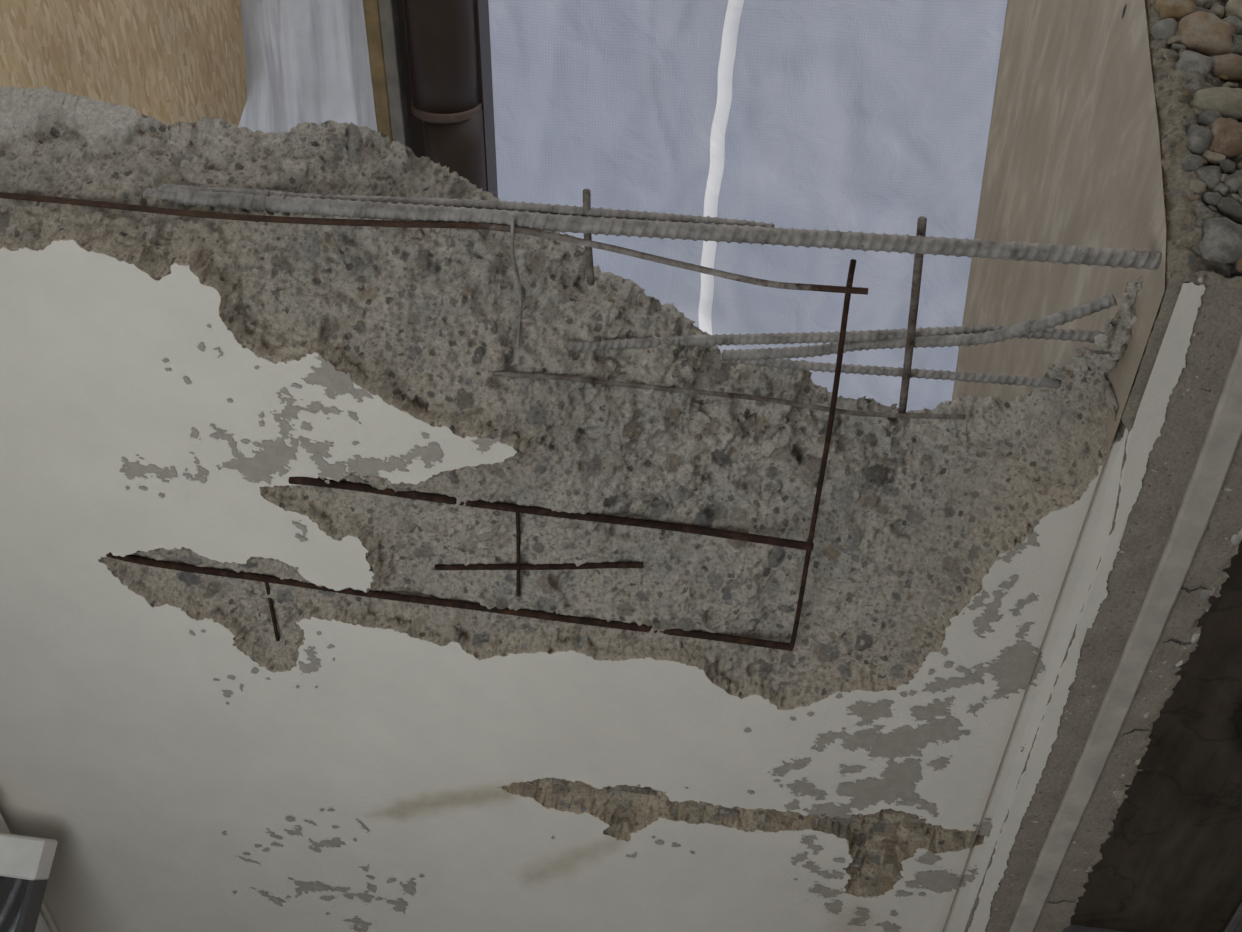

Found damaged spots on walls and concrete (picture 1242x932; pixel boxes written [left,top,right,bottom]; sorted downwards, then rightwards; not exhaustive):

spalling [0,0,1242,717]
peeling [236,808,370,866]
spalling [497,696,993,915]
peeling [251,864,424,932]
peeling [847,906,901,932]